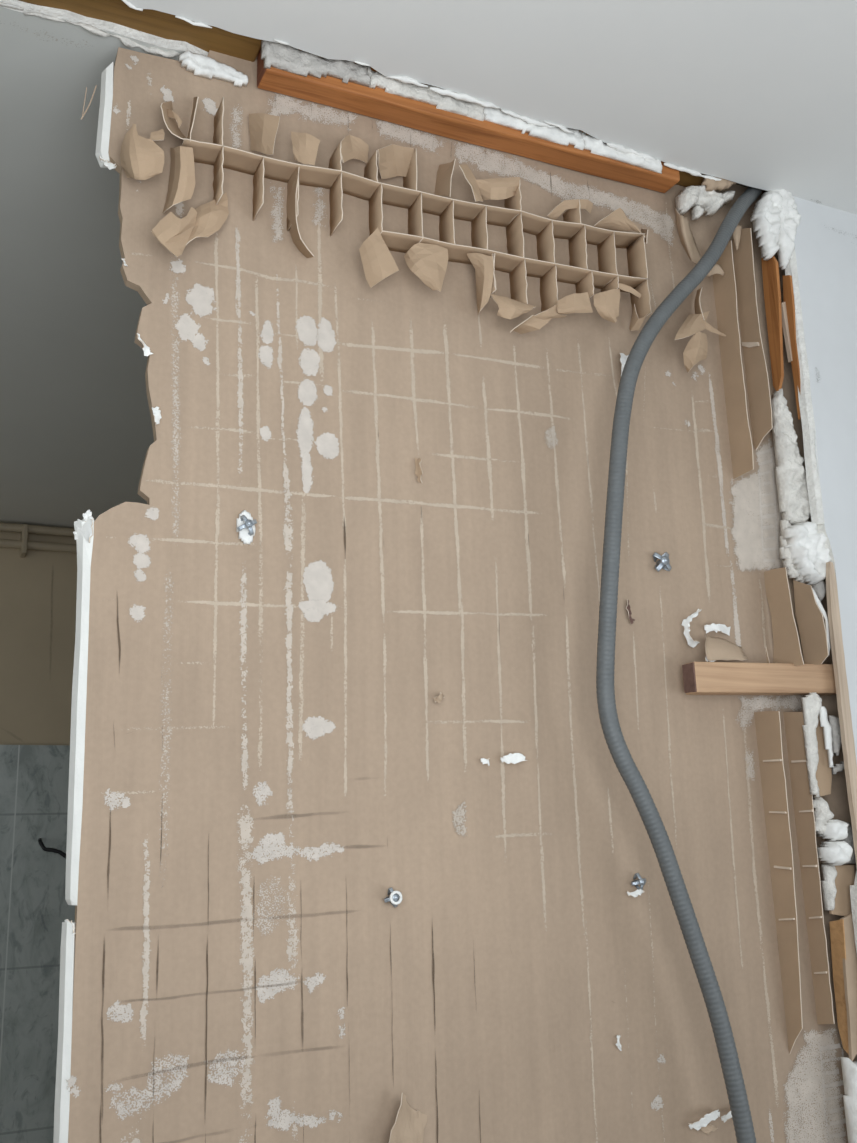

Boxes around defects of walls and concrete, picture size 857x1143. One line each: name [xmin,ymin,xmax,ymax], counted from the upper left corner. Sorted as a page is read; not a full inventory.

spalling [261,39,722,181]